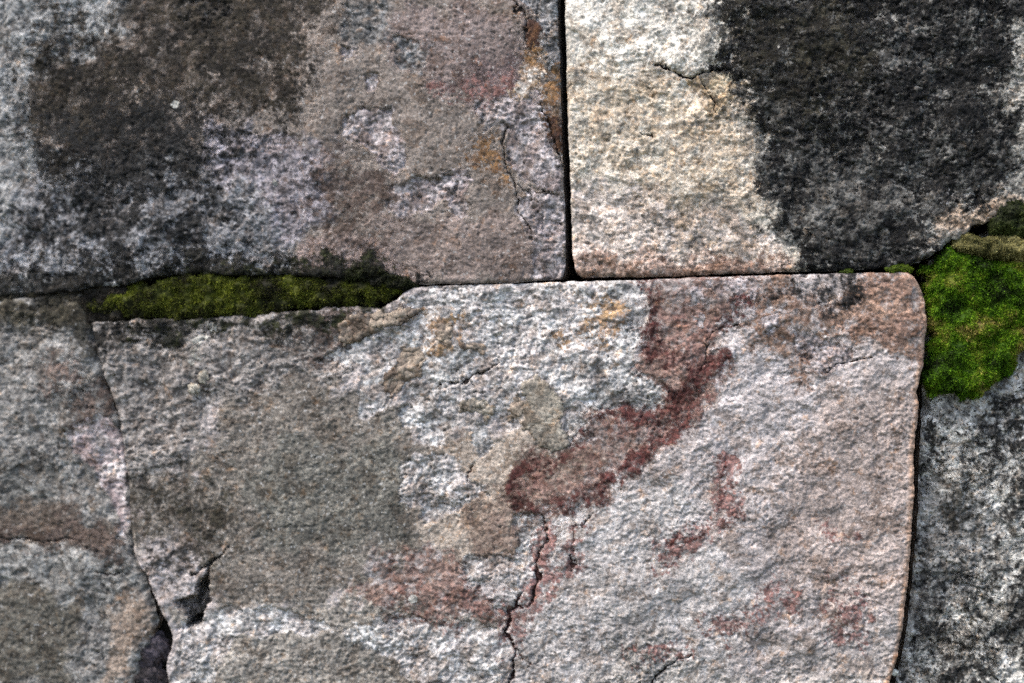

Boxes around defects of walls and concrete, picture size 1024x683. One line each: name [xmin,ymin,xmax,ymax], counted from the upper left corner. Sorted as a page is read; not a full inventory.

damp [6,0,331,201]
crack [501,127,533,232]
crack [654,64,729,113]
damp [700,0,1024,272]
crack [191,546,230,576]
crack [504,516,590,683]